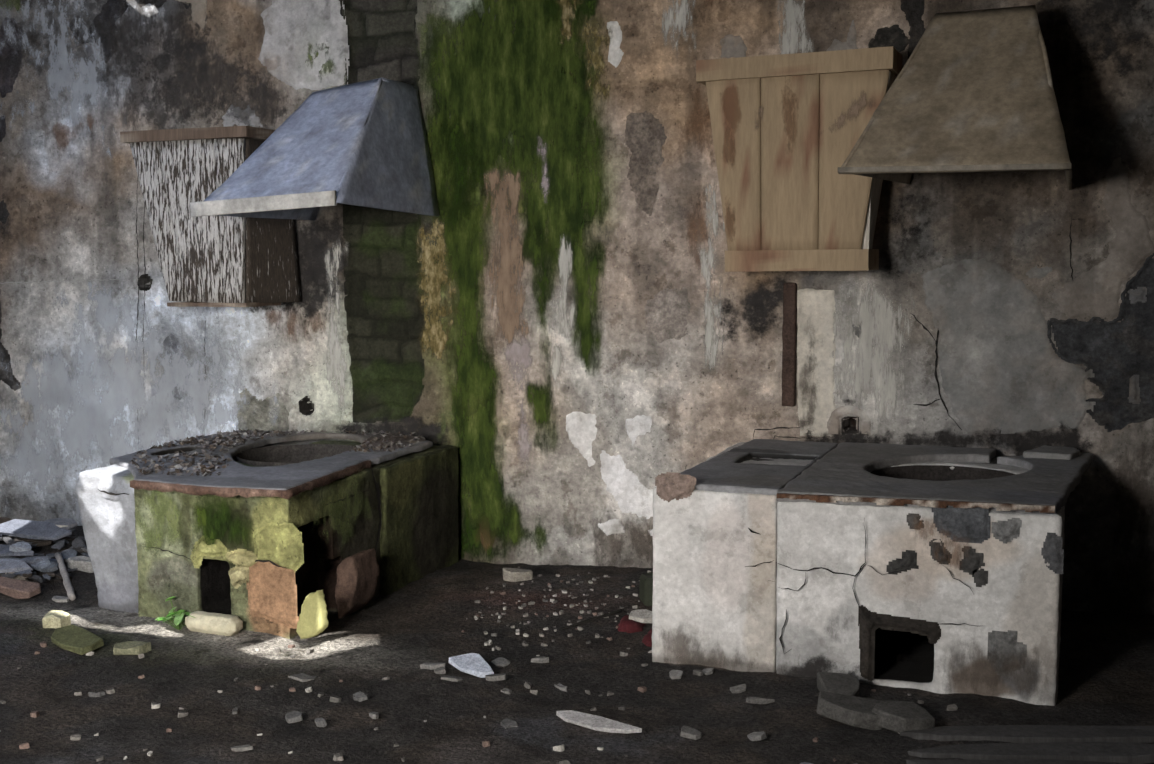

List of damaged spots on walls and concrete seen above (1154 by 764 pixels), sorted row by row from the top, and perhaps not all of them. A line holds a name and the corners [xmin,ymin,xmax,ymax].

damp [0,0,285,131]
spalling [868,0,926,59]
damp [539,144,549,197]
spalling [0,293,28,391]
damp [434,168,653,568]
crack [910,313,962,430]
spalling [1047,253,1154,432]